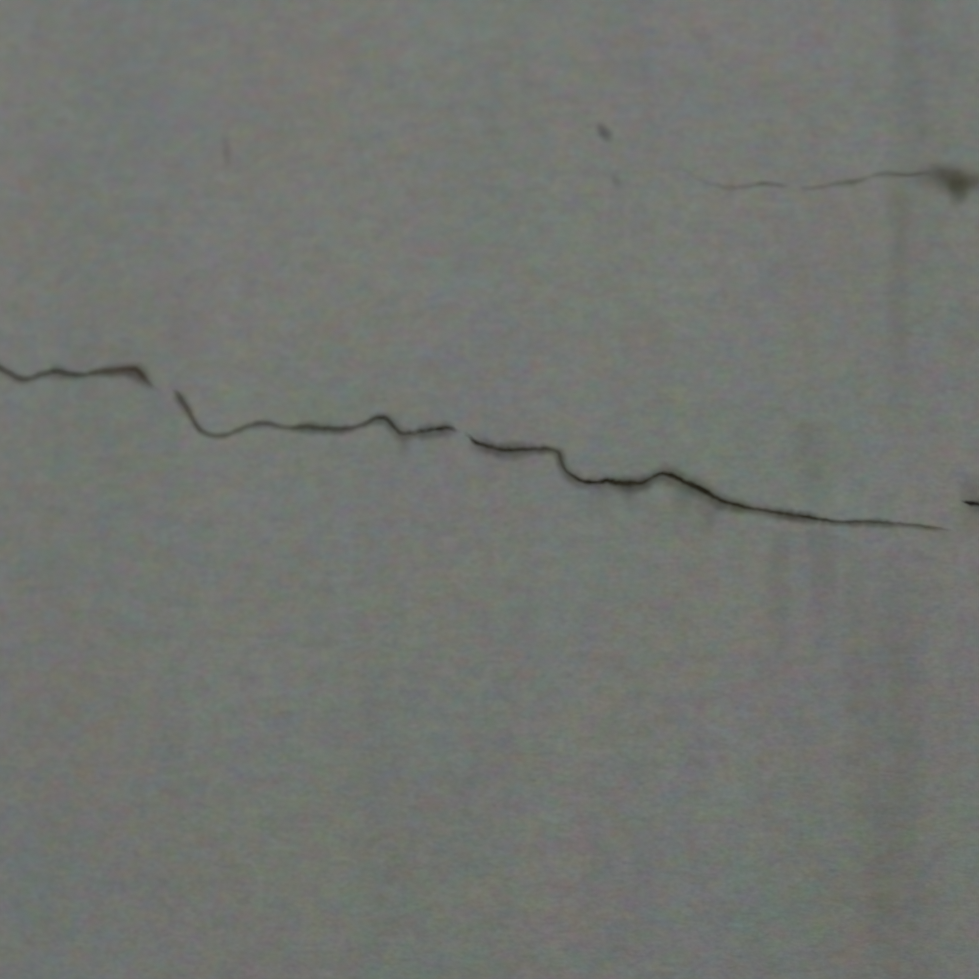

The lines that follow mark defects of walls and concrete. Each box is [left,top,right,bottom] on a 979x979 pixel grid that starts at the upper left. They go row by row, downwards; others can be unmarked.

crack [0,367,945,530]
crack [962,499,979,507]